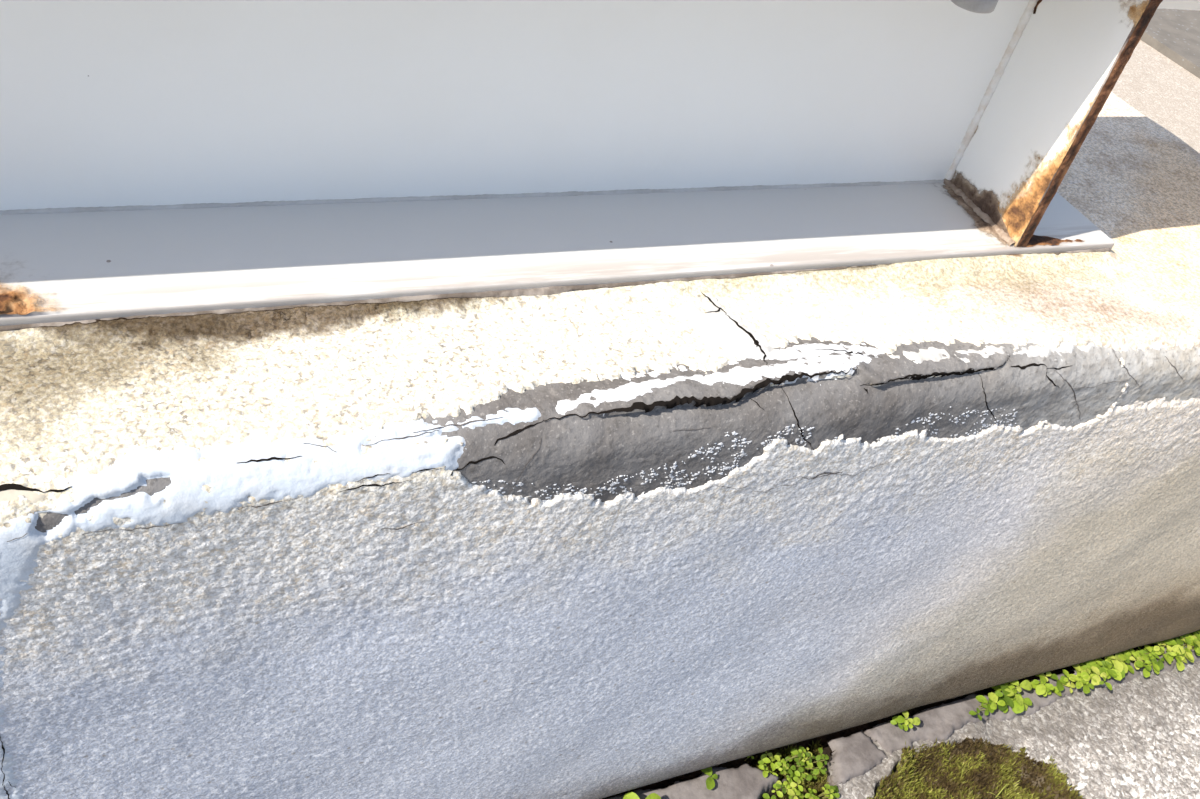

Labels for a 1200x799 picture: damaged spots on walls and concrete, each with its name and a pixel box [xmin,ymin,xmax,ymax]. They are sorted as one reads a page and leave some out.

corrosion [943,0,1163,247]
corrosion [0,285,56,315]
crack [0,484,72,493]
spalling [0,296,1200,630]
crack [238,290,1139,502]
crack [0,737,16,799]
peeling [0,647,23,799]